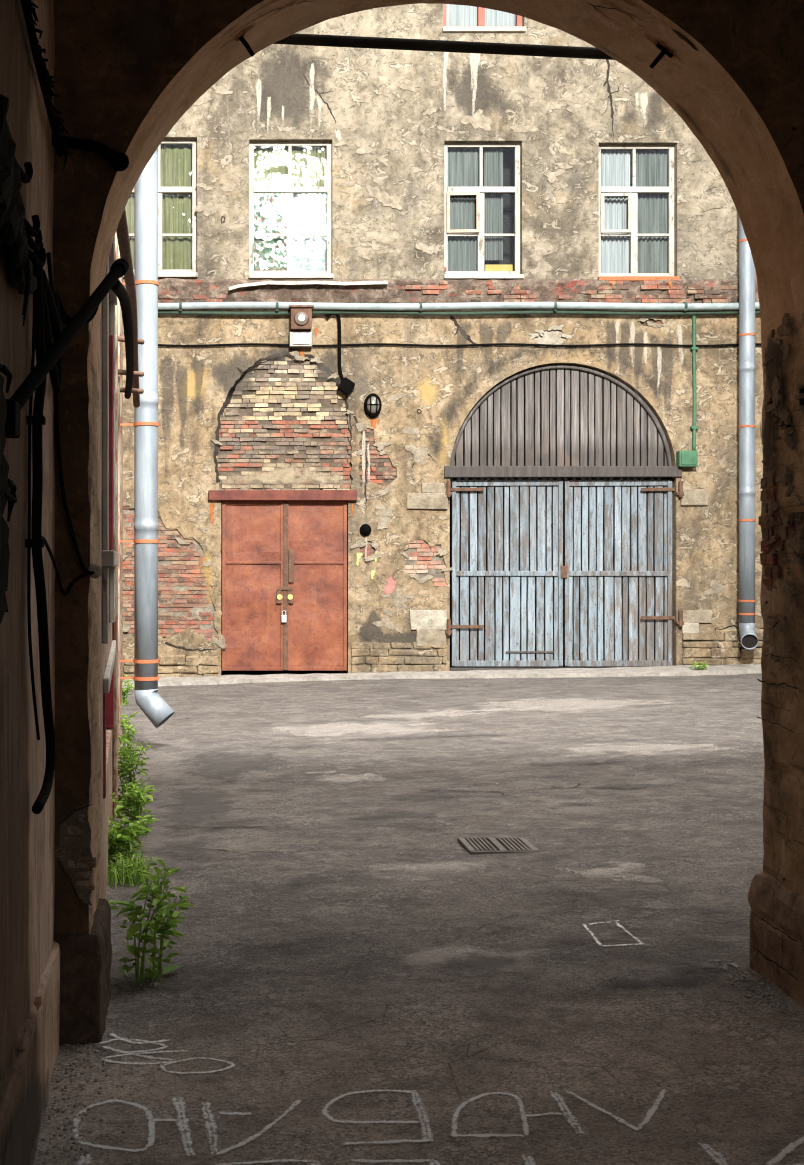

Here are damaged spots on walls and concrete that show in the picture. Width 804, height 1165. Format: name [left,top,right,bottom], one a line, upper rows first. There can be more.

crack [587,3,666,28]
damp [258,55,327,123]
flaking render [461,109,493,131]
crack [603,60,620,137]
flaking render [330,121,434,263]
flaking render [541,146,579,188]
flaking render [465,281,537,302]
flaking render [529,239,565,278]
flaking render [211,351,397,565]
flaking render [123,505,134,643]
flaking render [158,511,227,650]
flaking render [372,539,454,633]